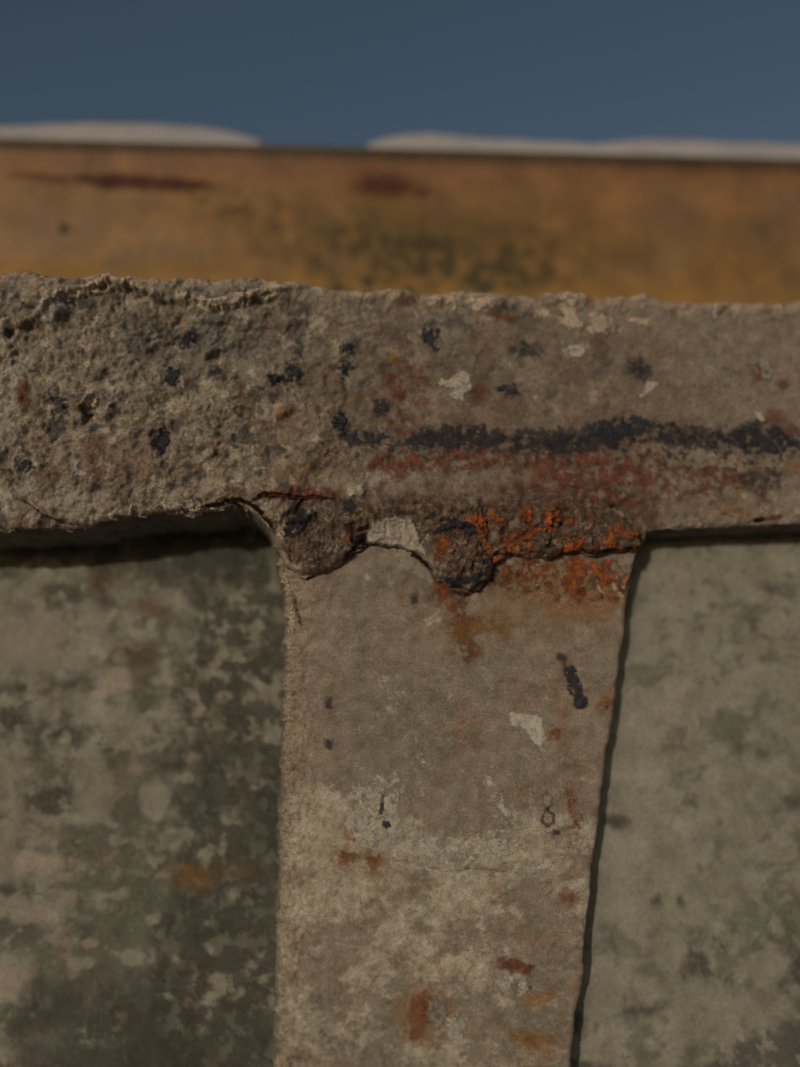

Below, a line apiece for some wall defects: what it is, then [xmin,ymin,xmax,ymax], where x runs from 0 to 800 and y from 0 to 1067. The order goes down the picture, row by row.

crack [145,483,332,624]
corrosion [260,446,750,662]
water stain [557,654,588,709]
water stain [0,708,80,744]
water stain [0,754,70,864]
water stain [26,527,286,1067]
corrosion [491,957,551,1005]
corrosion [398,989,451,1042]
water stain [710,1021,800,1067]